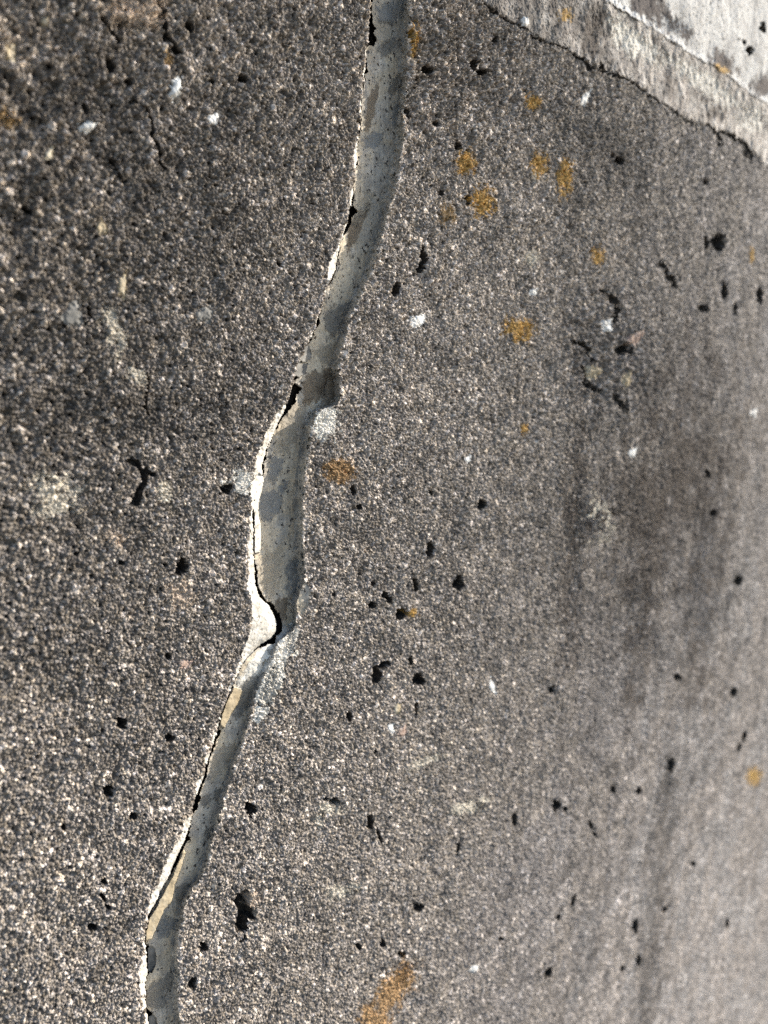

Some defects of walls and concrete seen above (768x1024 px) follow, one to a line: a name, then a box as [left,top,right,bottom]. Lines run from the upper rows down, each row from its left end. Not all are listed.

crack [131,98,168,172]
crack [483,3,754,163]
crack [139,0,413,1024]